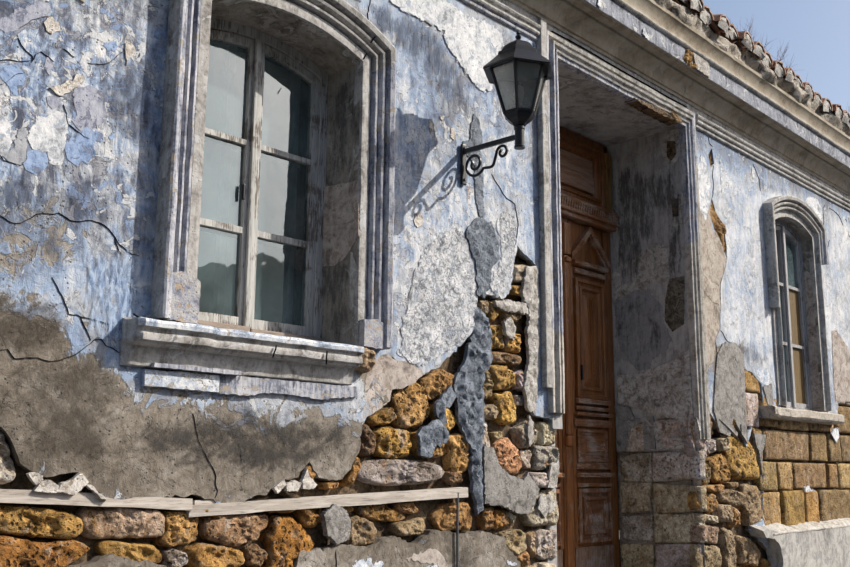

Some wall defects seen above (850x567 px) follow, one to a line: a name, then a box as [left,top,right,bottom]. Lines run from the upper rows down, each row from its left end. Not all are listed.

peeling [0,0,61,34]
crack [0,16,125,85]
peeling [390,0,504,92]
peeling [0,74,115,174]
crack [0,212,139,256]
peeling [698,152,727,368]
water stain [0,292,63,348]
crack [3,277,184,361]
spalling [665,276,685,332]
spalling [0,209,560,567]
water stain [143,409,344,471]
spalling [617,367,850,567]